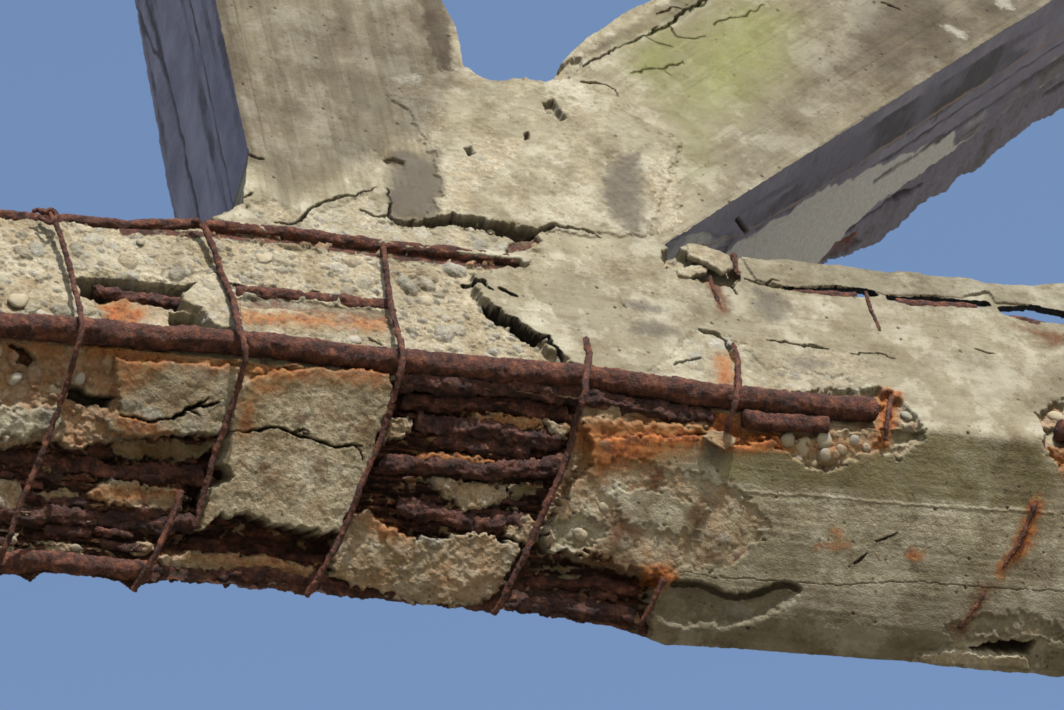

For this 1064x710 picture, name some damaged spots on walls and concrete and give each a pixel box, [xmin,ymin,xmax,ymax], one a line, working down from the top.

crack [302,188,424,229]
rust [103,300,144,323]
spalling [0,215,567,363]
crack [475,284,564,363]
peeling [663,253,1064,319]
crack [120,398,219,424]
crack [229,427,364,462]
rust [414,452,495,463]
spalling [0,337,925,635]
rust [576,412,789,490]
rust [871,388,902,449]
spalling [912,636,1054,674]